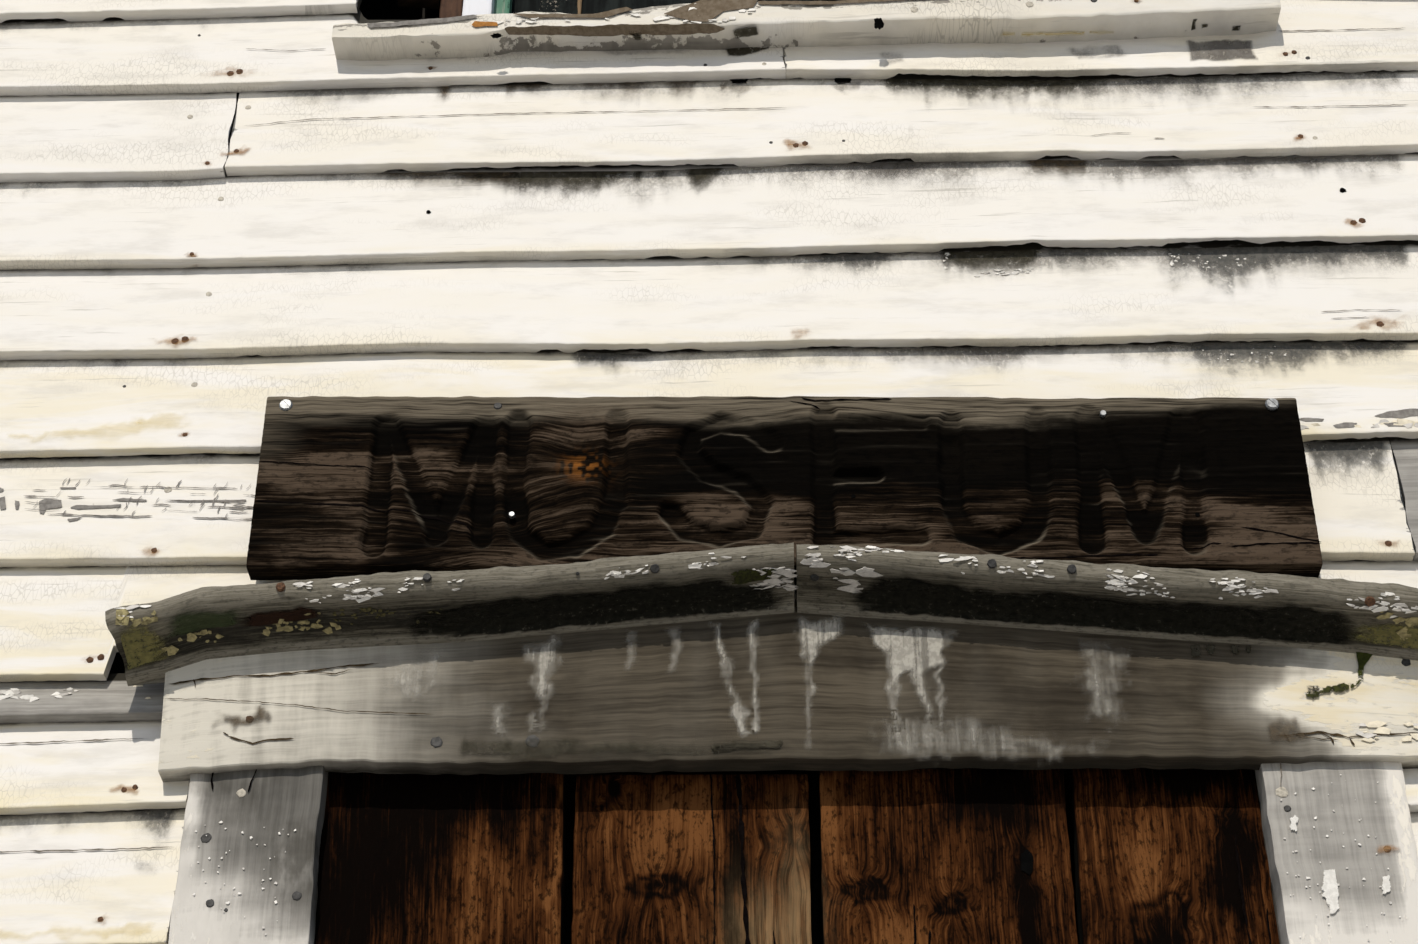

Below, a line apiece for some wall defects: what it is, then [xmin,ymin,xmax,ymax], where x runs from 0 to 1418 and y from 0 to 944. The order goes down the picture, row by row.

peeling [367,15,477,28]
peeling [496,0,901,37]
water stain [884,79,1106,97]
water stain [385,170,667,190]
water stain [941,249,1123,268]
water stain [1167,245,1406,279]
water stain [1189,342,1402,366]
peeling [1346,592,1418,641]
water stain [415,568,777,696]
peeling [0,687,79,702]
peeling [1355,721,1418,743]
peeling [1284,815,1401,924]